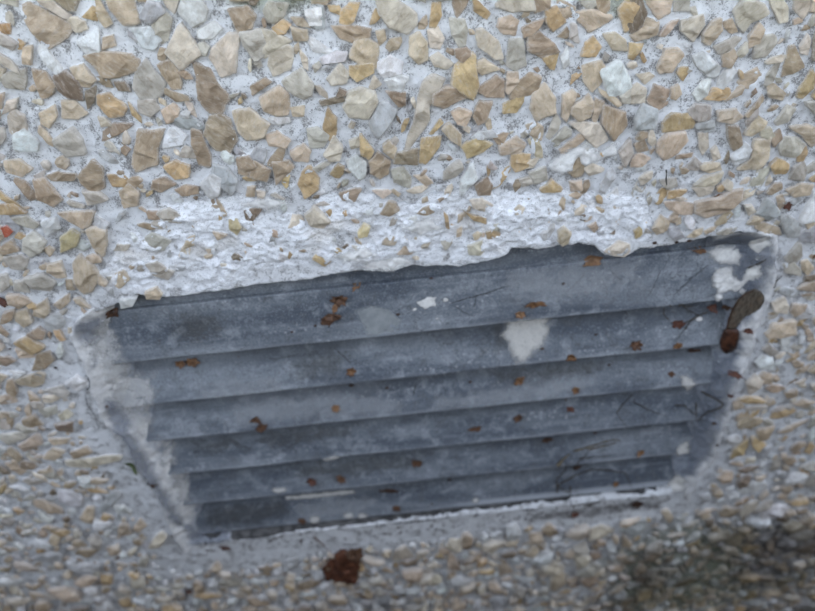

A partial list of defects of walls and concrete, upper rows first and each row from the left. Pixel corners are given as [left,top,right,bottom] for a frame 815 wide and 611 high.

damp [707,234,776,296]